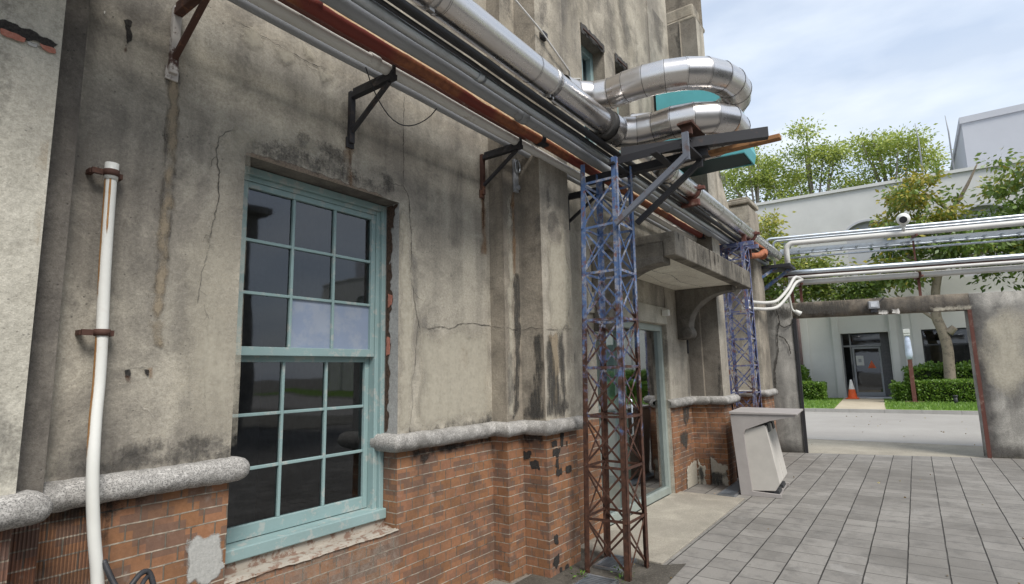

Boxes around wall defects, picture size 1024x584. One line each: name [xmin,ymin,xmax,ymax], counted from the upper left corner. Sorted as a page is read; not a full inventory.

flaking render [0,19,57,54]
crack [197,130,233,326]
spalling [245,152,398,432]
crack [386,96,571,423]
water stain [513,274,569,419]
peeling [687,457,729,489]